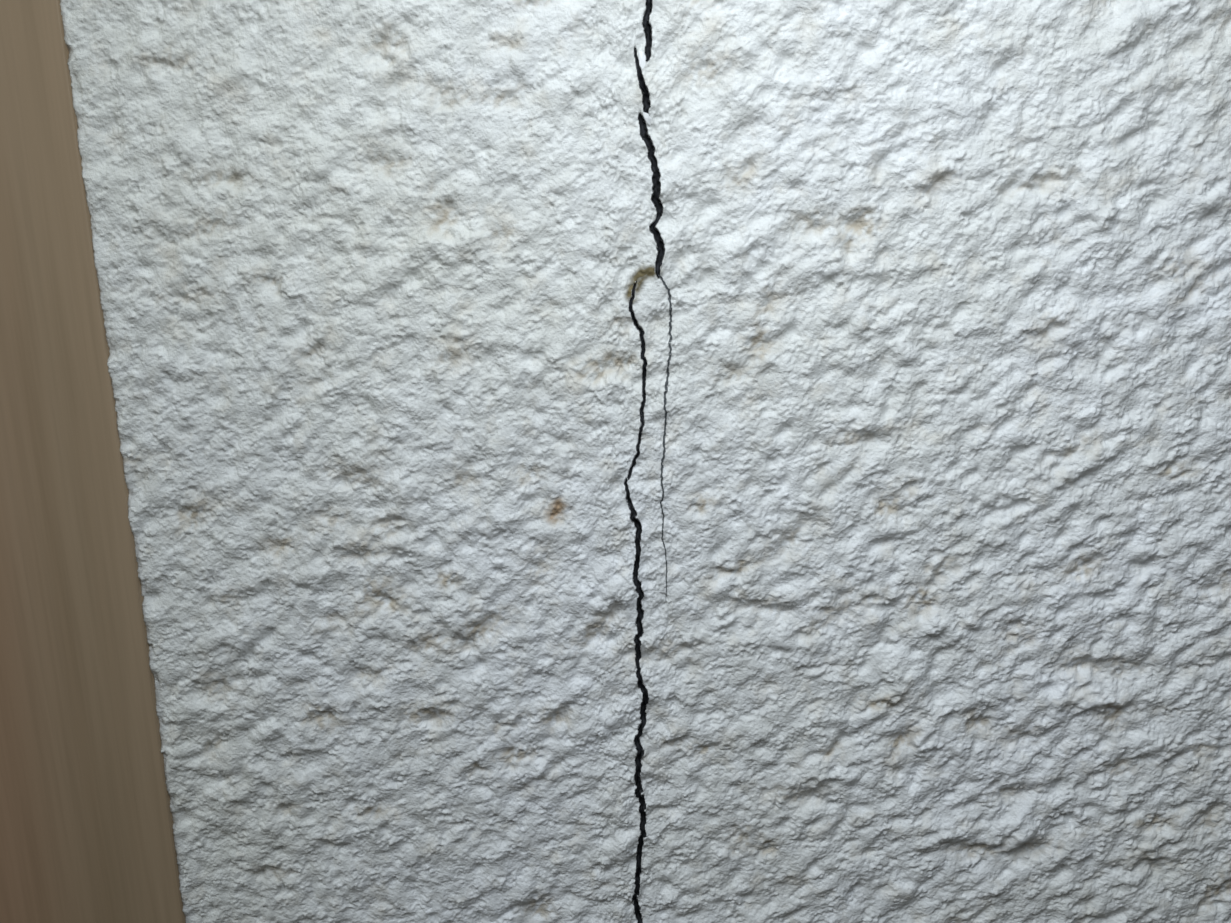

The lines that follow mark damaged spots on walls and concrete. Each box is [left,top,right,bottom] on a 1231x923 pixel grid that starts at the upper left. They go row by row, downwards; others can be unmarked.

crack [624,0,672,923]